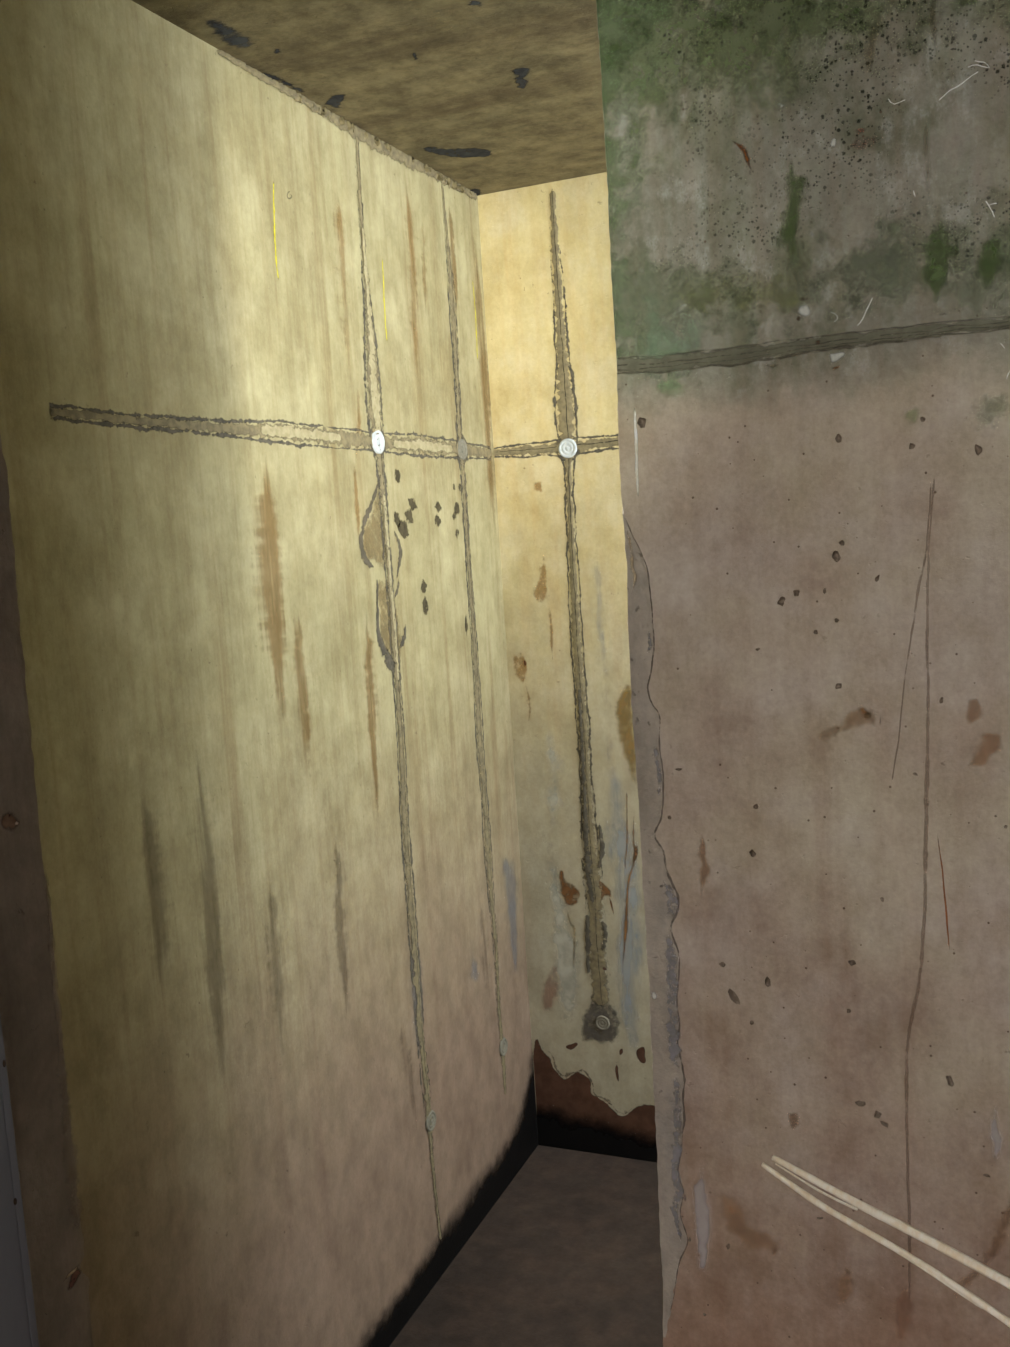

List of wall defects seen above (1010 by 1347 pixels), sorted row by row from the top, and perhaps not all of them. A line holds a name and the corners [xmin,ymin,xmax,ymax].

damp [774,0,1010,198]
damp [797,298,810,321]
spalling [533,514,691,1337]